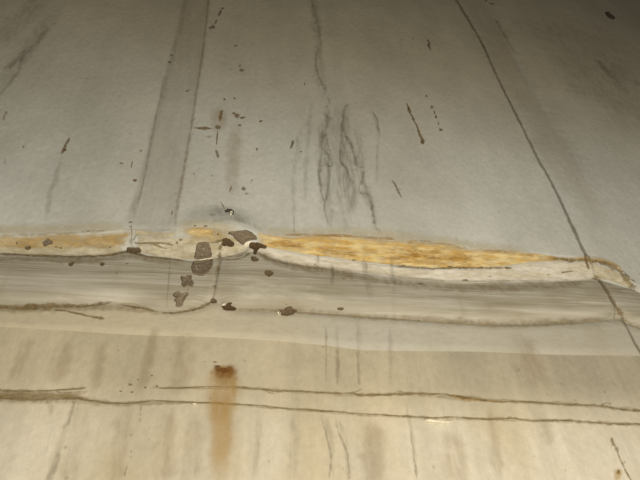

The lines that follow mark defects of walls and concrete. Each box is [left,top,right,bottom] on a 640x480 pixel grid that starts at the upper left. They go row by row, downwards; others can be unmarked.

peeling [0,230,640,356]
rust [214,361,233,378]
crack [376,414,453,424]